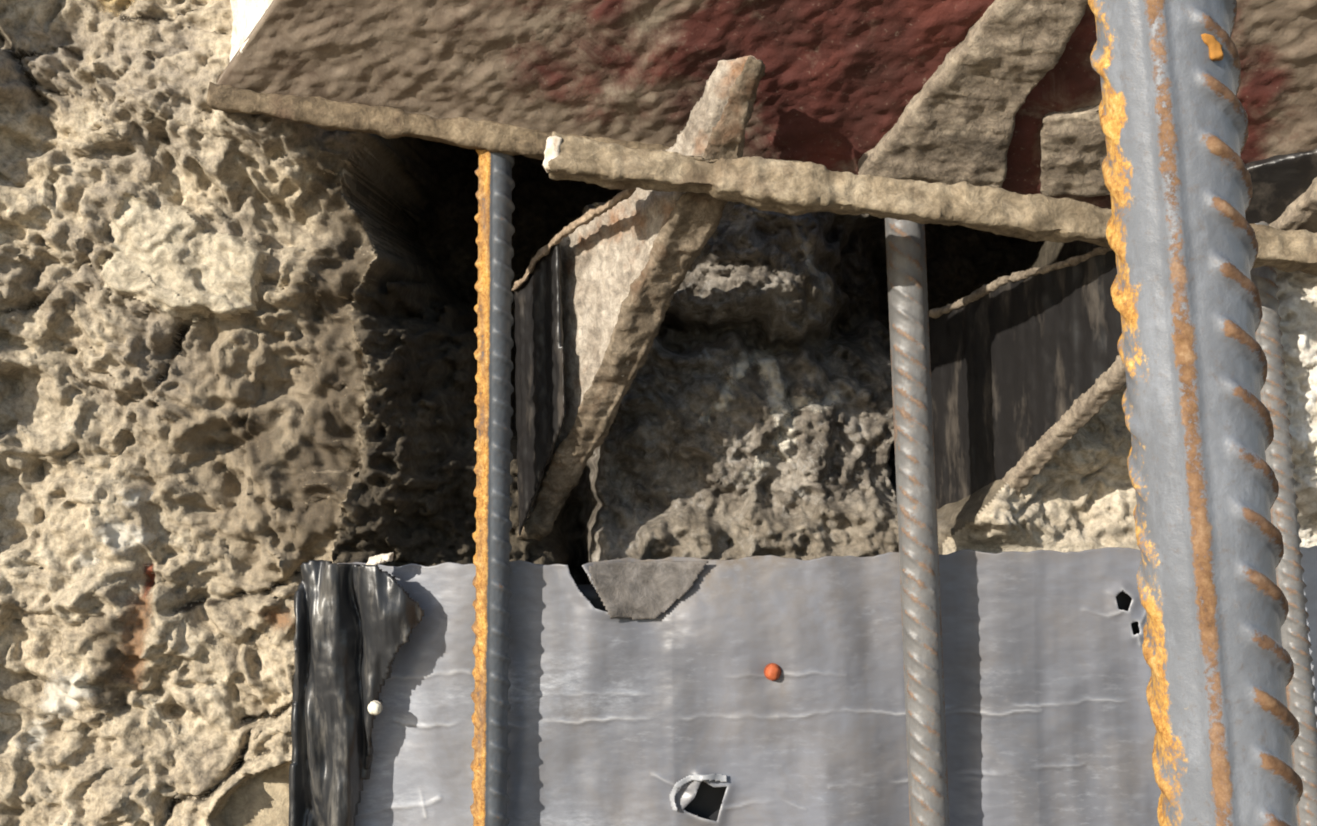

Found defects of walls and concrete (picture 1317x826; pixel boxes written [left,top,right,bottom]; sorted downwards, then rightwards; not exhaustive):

corrosion [118,564,155,683]
spalling [332,0,1317,826]